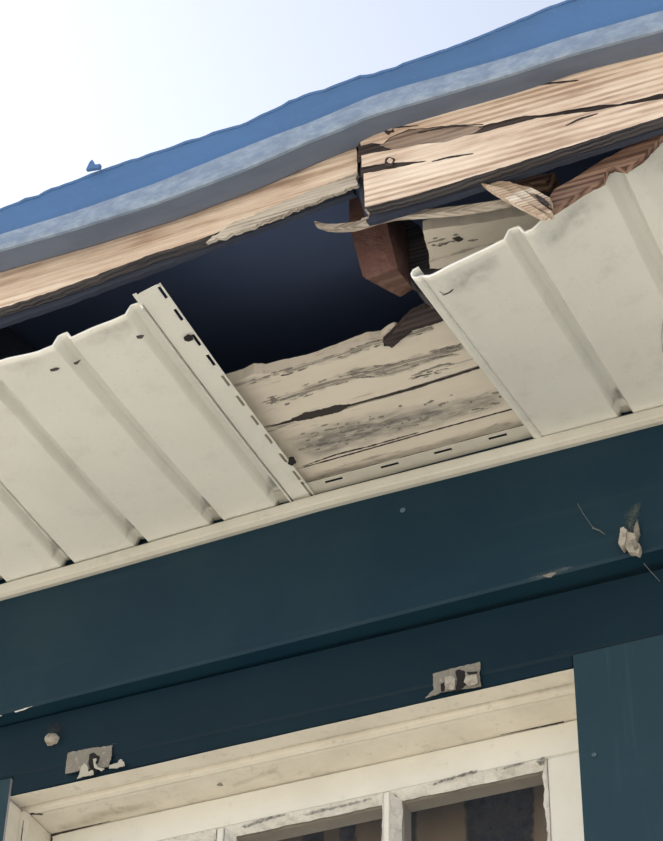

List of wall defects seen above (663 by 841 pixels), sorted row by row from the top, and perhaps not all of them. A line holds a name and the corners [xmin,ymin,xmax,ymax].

crack [542,78,579,86]
crack [357,95,663,179]
peeling [250,339,383,384]
peeling [263,343,462,405]
peeling [425,662,481,698]
peeling [65,745,125,779]